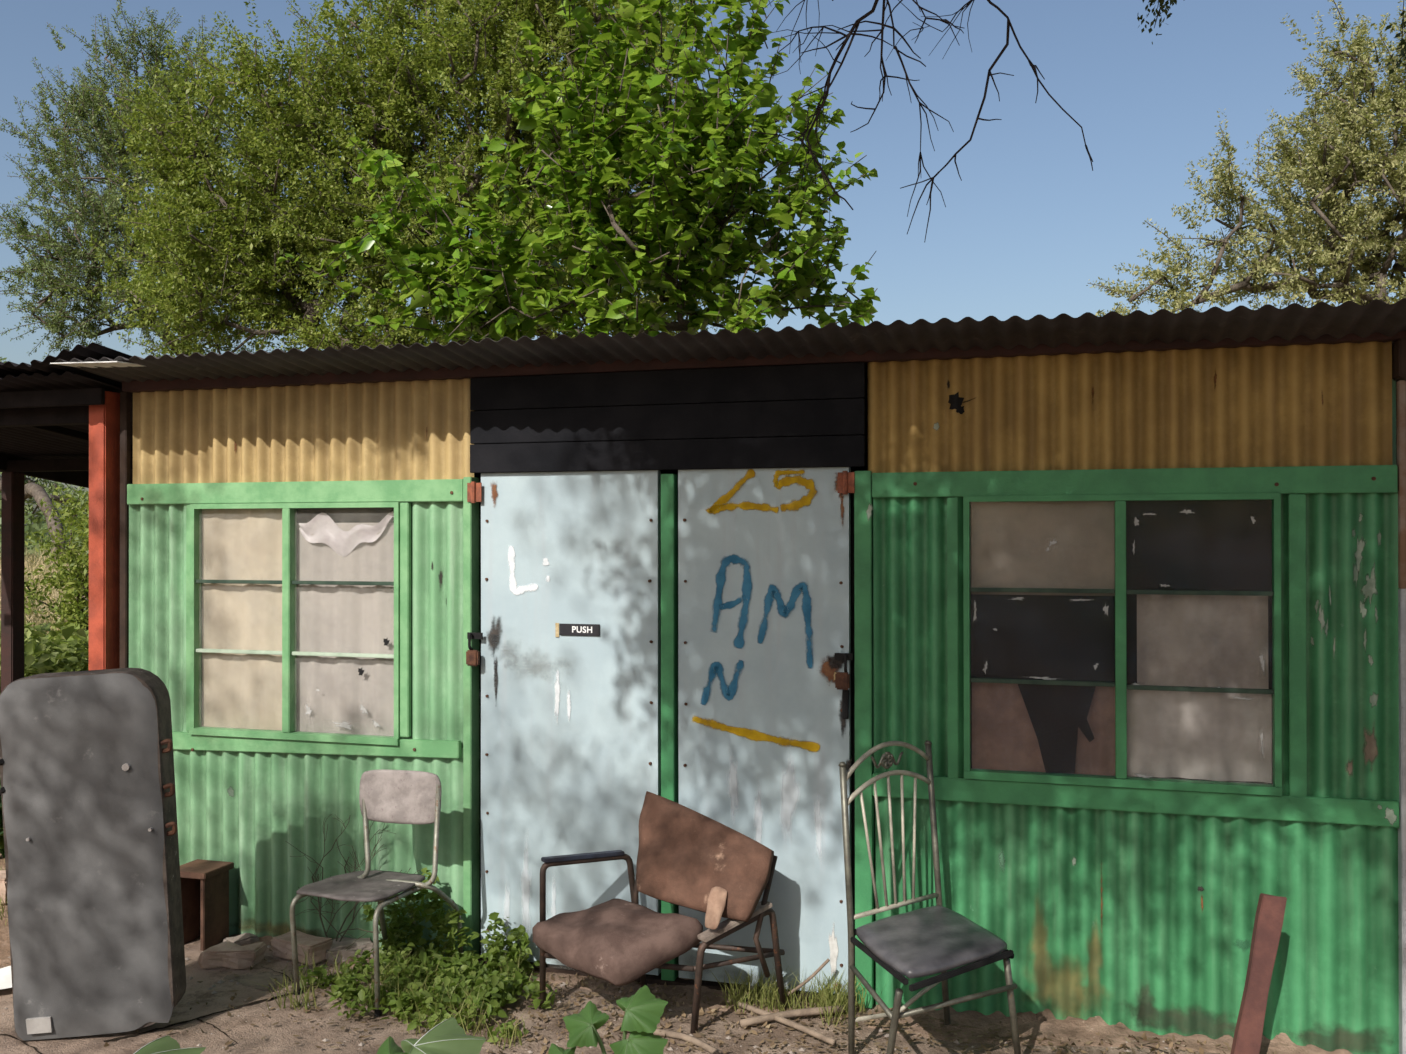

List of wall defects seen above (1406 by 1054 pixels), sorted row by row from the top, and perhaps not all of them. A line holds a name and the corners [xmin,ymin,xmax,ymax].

rust [835,477,844,524]
peeling [1352,514,1381,666]
peeling [1311,586,1335,652]
rust [821,655,844,683]
peeling [1347,728,1378,775]
peeling [1378,805,1397,825]